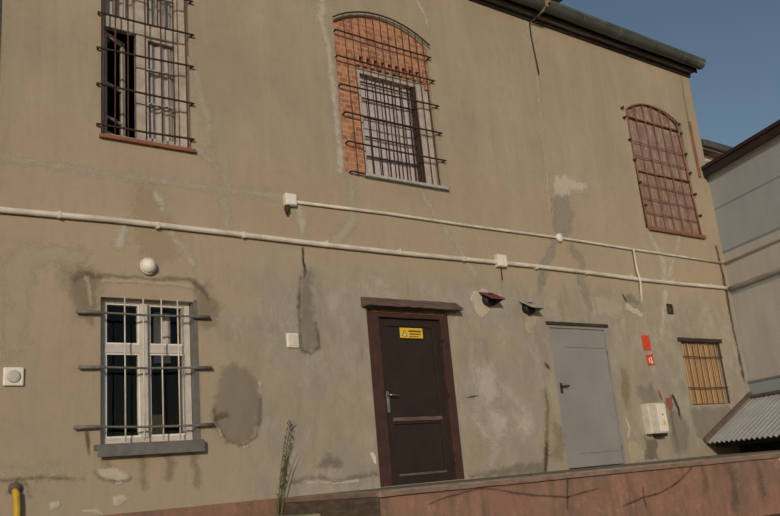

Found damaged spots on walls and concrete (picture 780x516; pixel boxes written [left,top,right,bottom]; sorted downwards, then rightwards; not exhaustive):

crack [316,0,344,173]
flaking render [98,467,130,485]